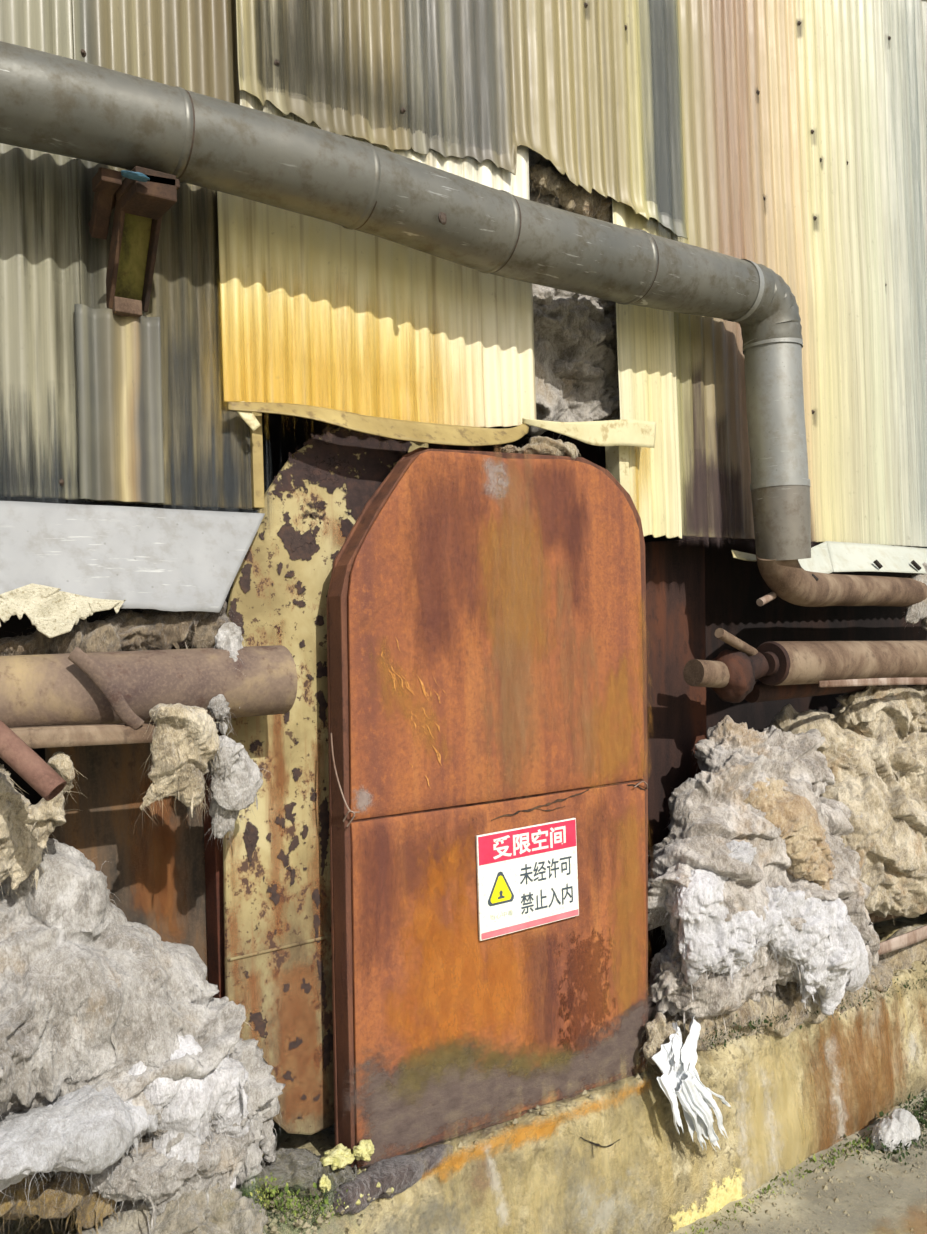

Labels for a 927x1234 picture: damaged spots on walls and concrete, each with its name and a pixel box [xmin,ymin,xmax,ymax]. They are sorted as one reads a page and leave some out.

peeling [0,583,126,638]
peeling [228,563,252,637]
peeling [306,661,328,726]
peeling [243,780,330,1011]
peeling [248,1007,268,1038]
peeling [285,1037,303,1052]
peeling [323,1029,333,1070]
leakage [351,1001,650,1175]
rust [807,1015,903,1154]